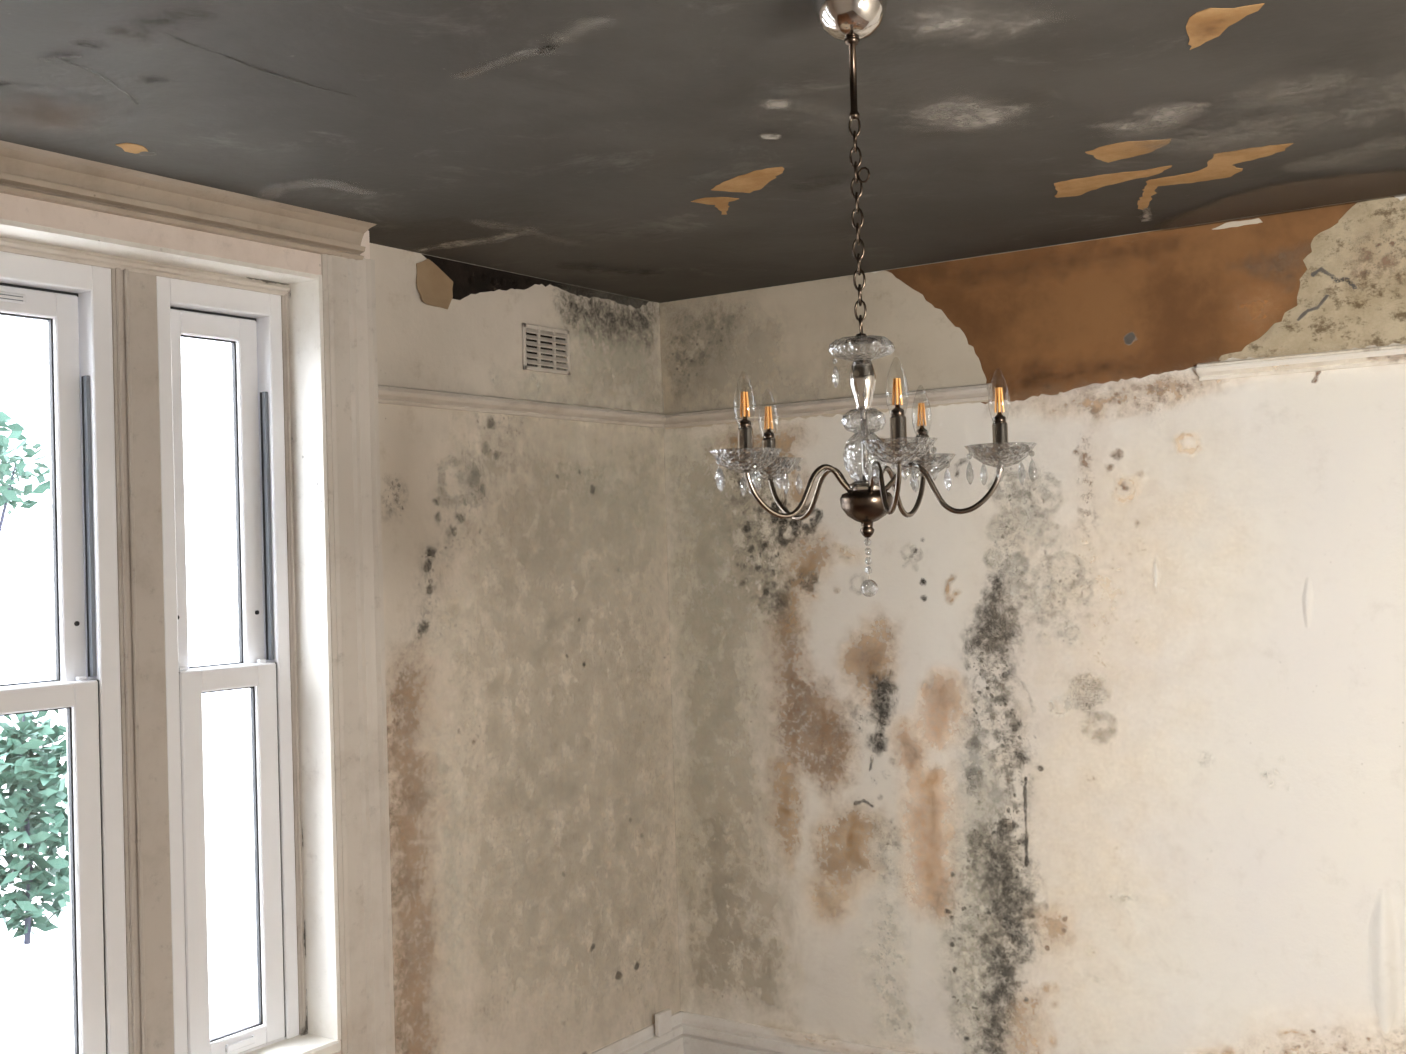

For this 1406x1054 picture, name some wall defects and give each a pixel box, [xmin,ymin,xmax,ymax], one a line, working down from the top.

spalling [1186,3,1264,50]
spalling [115,143,156,156]
spalling [691,167,784,215]
peeling [416,259,453,309]
flaking render [878,138,1406,416]
damp [560,293,652,387]
damp [435,469,485,536]
damp [424,548,435,594]
damp [390,667,436,1054]
damp [1045,917,1067,950]